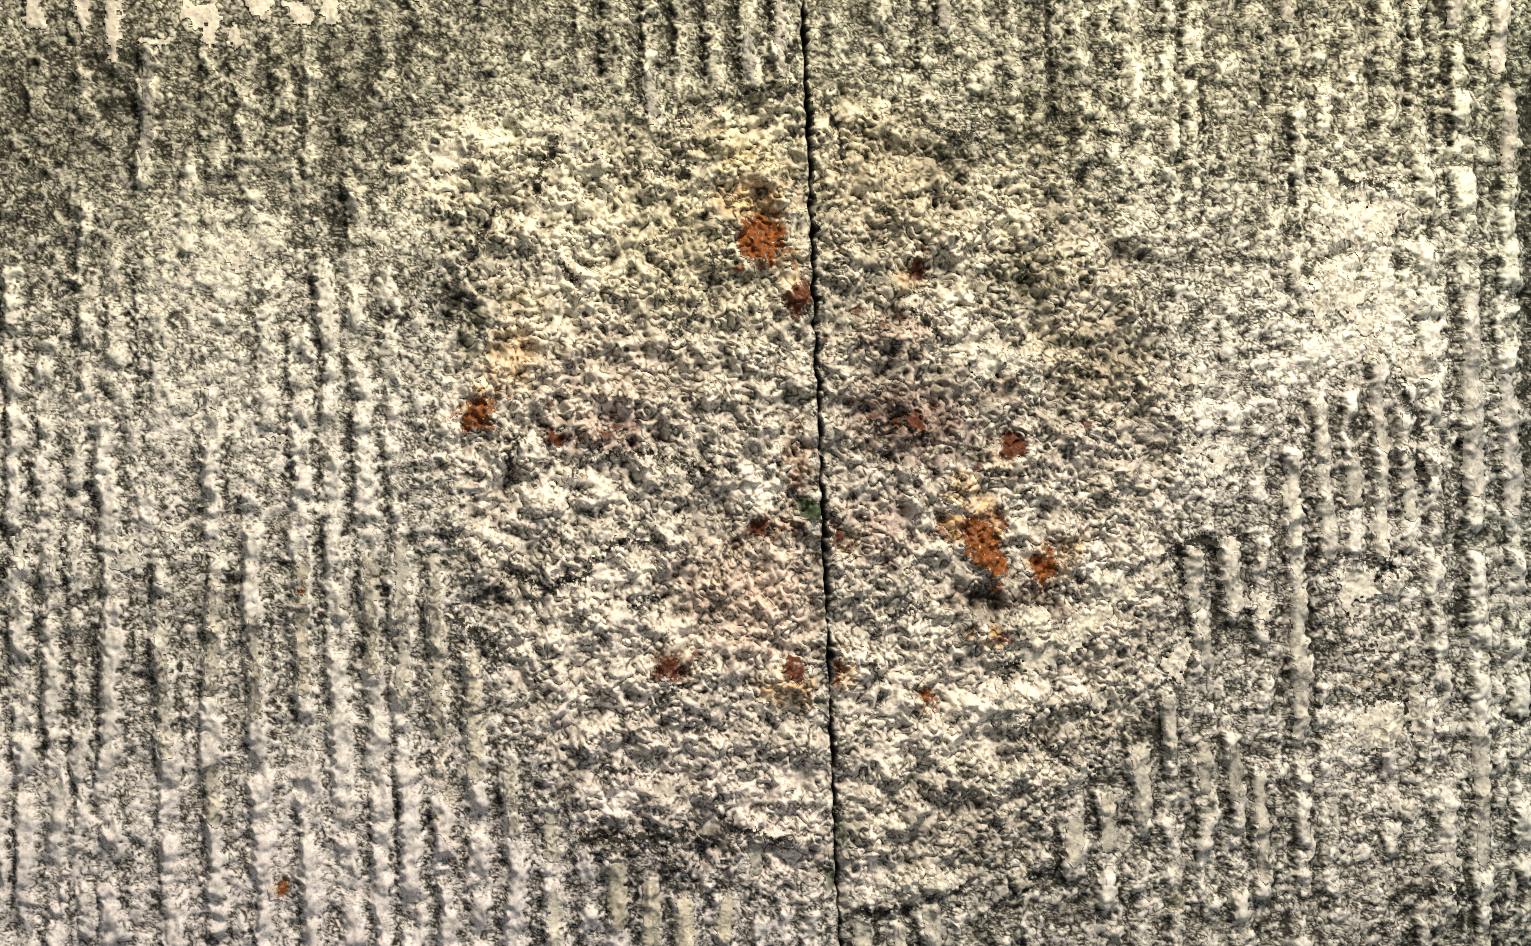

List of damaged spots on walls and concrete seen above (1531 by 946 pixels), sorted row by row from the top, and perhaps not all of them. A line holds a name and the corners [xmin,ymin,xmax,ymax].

rust [702,163,814,320]
rust [850,243,932,332]
rust [451,304,626,452]
rust [844,397,938,439]
rust [930,430,1100,594]
rust [649,640,710,685]
rust [744,638,859,722]